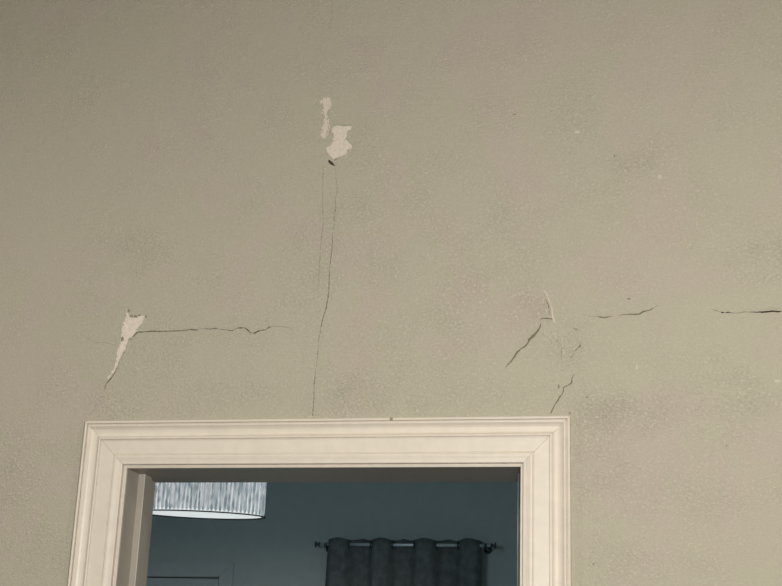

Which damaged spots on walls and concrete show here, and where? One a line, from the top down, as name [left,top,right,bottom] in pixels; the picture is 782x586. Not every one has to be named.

peeling [318,96,354,166]
peeling [108,309,147,379]
crack [131,325,293,338]
crack [504,316,555,368]
crack [561,304,660,352]
crack [712,307,782,315]
crack [549,373,574,414]